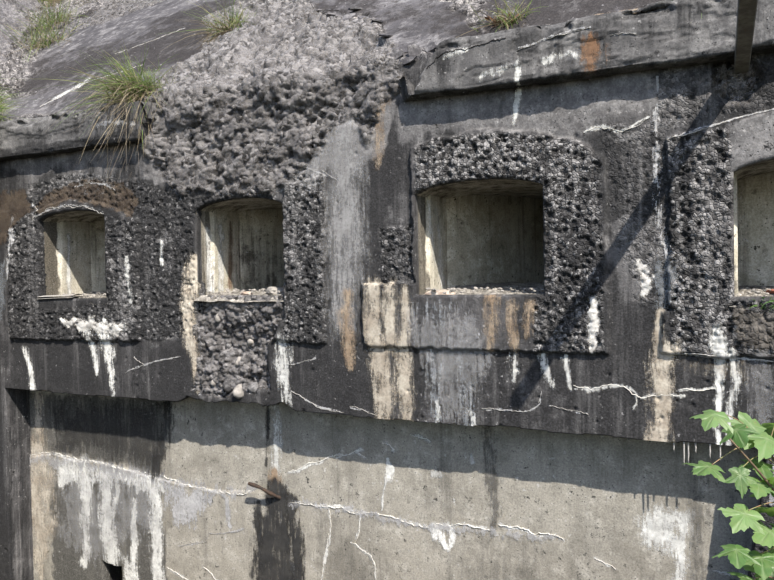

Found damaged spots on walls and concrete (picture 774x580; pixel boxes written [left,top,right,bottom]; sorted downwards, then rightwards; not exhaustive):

corrosion [581,32,607,75]
crack [667,108,774,140]
leakage [485,295,535,382]
crack [484,391,587,414]
leakage [564,354,572,390]
crack [573,384,716,407]
leakage [709,325,741,445]
leakage [22,316,255,580]
crack [30,452,254,496]
crack [288,448,366,473]
leakage [251,336,557,580]
crack [292,501,565,580]